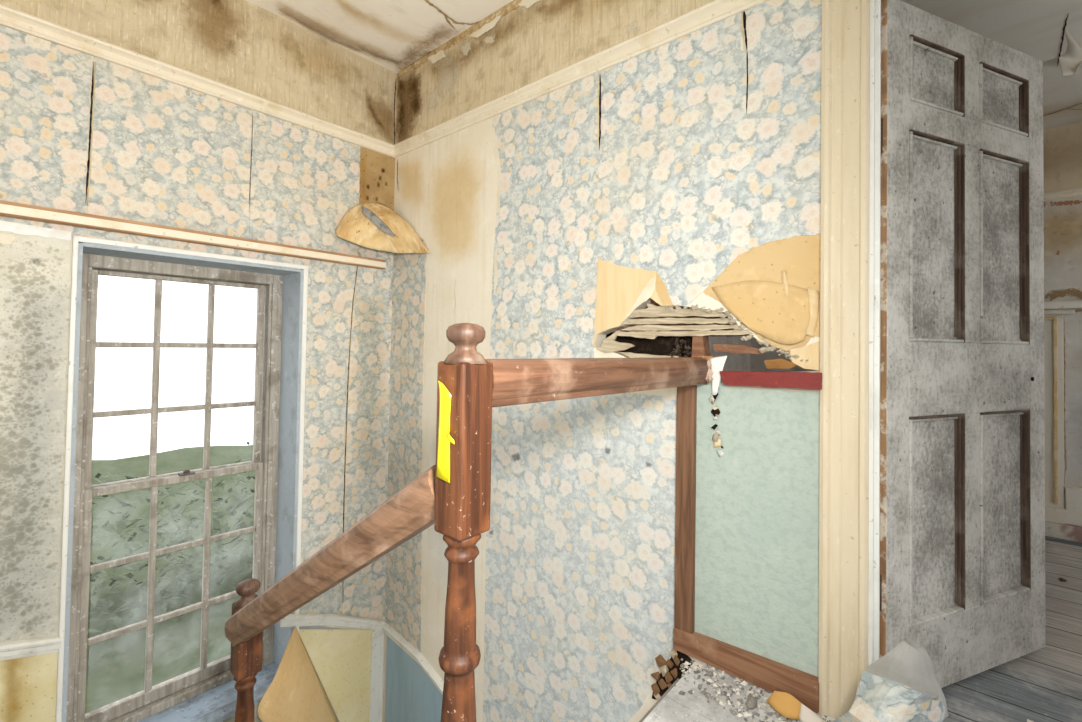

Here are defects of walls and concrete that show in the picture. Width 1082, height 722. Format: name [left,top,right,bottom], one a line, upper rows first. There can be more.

crack [425,0,480,29]
spalling [399,0,540,110]
flaking render [359,146,395,210]
spalling [597,273,820,383]
water stain [0,231,71,642]